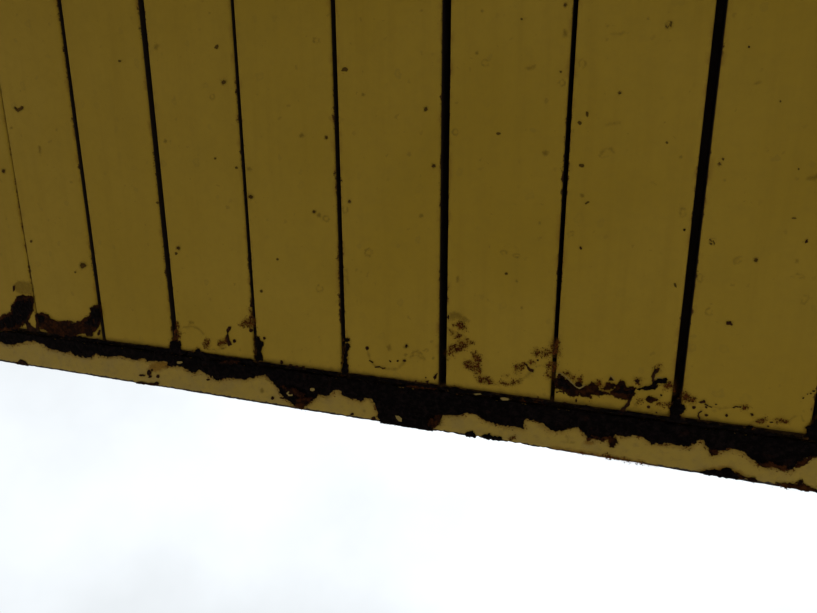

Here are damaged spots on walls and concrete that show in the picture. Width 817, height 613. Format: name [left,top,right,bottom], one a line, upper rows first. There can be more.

corrosion [0,286,817,493]